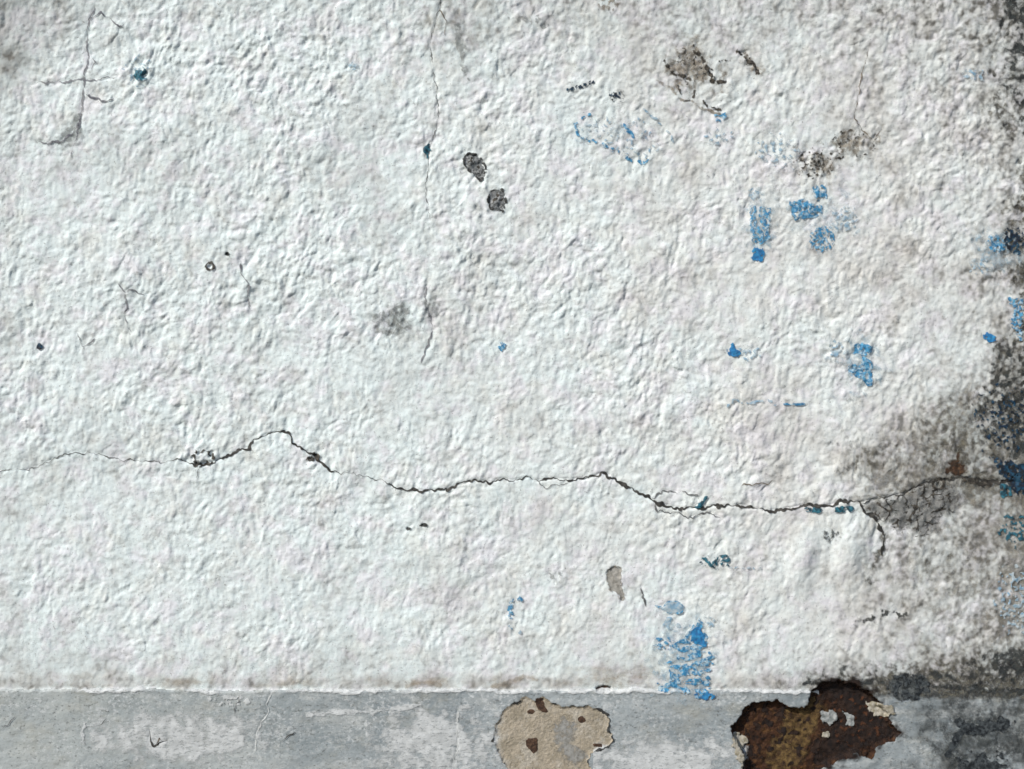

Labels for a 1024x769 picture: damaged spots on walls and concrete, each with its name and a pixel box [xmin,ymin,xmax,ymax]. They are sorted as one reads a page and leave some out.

crack [37,7,122,153]
damp [989,0,1024,140]
spalling [463,152,507,213]
peeling [748,188,771,245]
peeling [789,129,879,252]
damp [994,162,1024,297]
peeling [829,340,873,386]
damp [976,310,1024,499]
crack [0,430,1023,555]
spalling [606,565,625,601]
peeling [657,618,715,700]
spalling [491,696,614,769]